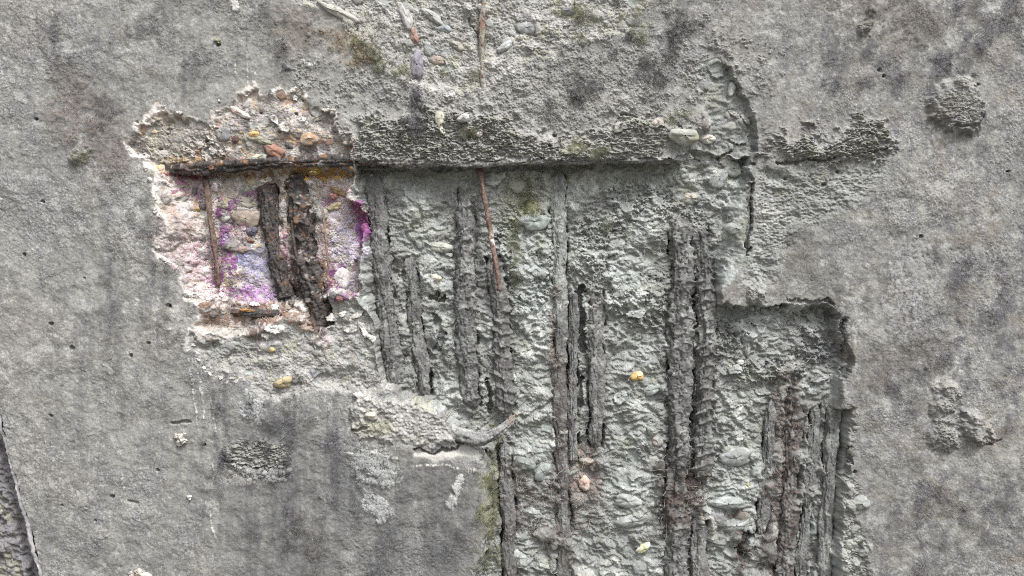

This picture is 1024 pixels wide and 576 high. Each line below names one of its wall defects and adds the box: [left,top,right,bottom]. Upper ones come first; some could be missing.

corrosion [161,155,431,396]
corrosion [452,189,517,416]
spalling [123,0,898,576]
corrosion [652,216,720,576]
crack [716,150,836,257]
corrosion [756,389,843,576]